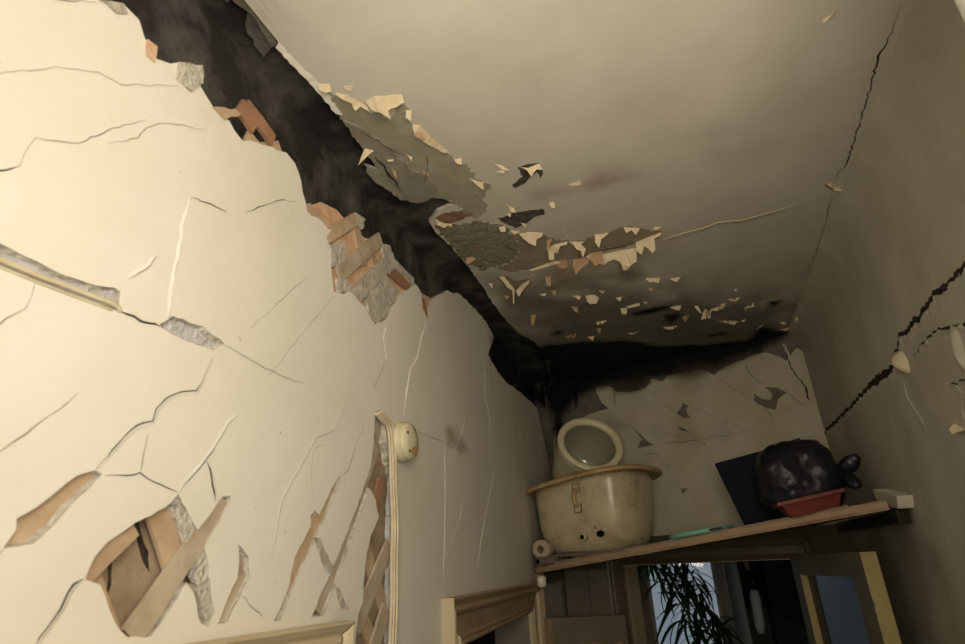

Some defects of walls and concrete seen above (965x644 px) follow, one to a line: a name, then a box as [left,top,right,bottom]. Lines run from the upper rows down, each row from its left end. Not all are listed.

crack [245,0,403,43]
flaking render [212,99,282,151]
peeling [225,0,663,303]
crack [121,194,295,327]
flaking render [307,202,431,323]
crack [97,297,333,500]
leakage [493,307,787,437]
crack [719,261,965,439]
flaking render [4,471,99,548]
crack [36,578,84,644]
flaking render [85,496,248,637]
flaking render [274,416,391,644]